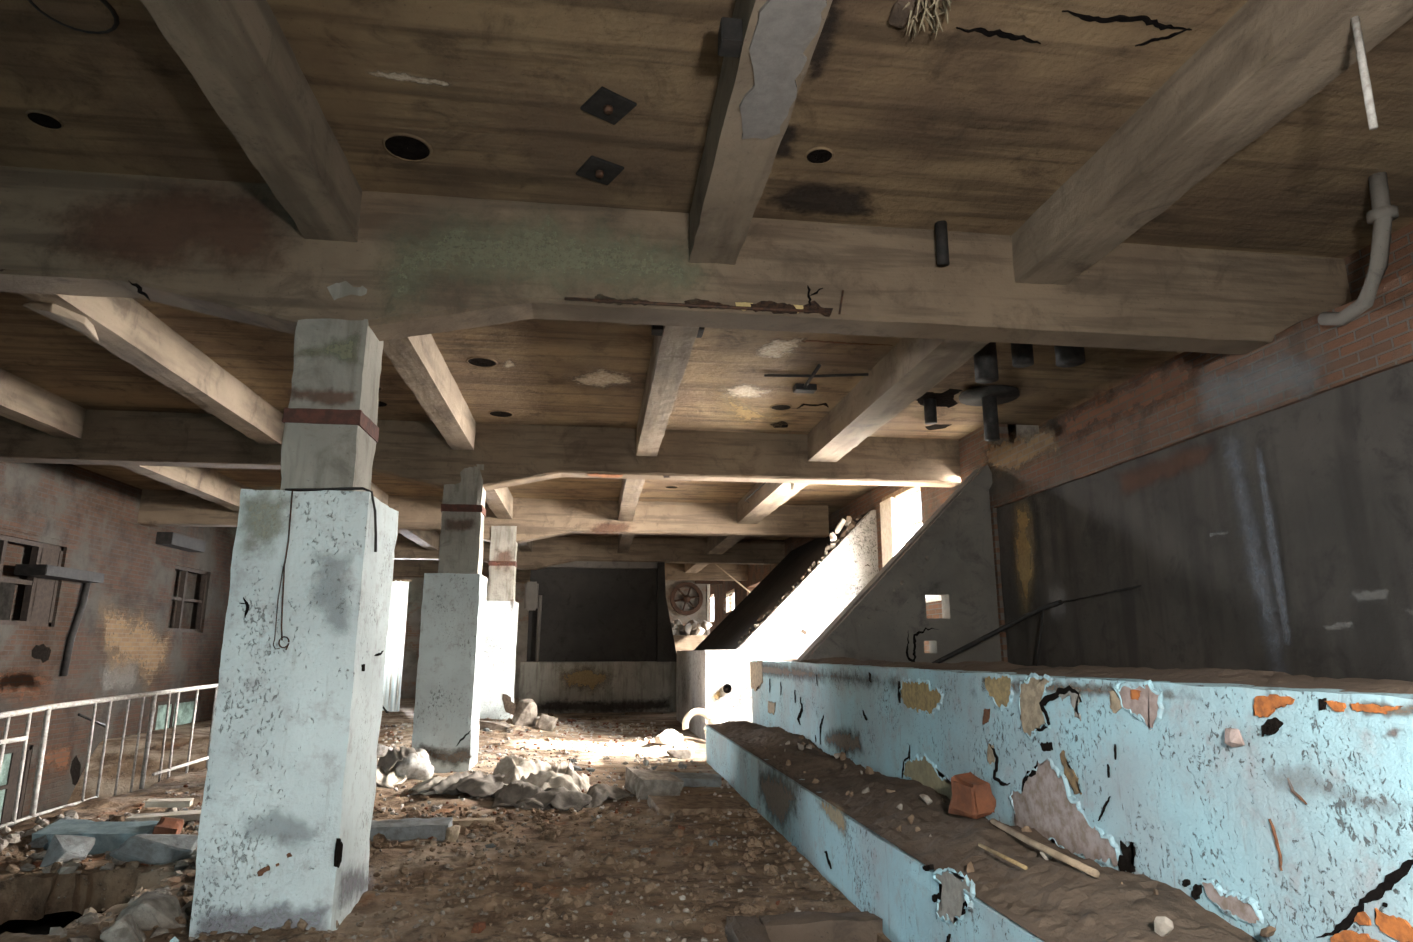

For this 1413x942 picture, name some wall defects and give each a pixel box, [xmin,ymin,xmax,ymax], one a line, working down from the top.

crack [956,27,1041,44]
crack [1062,10,1192,47]
peeling [985,673,1081,741]
crack [989,685,1082,792]
peeling [1109,680,1164,730]
flaking render [1253,694,1295,737]
flaking render [1326,700,1402,714]
peeling [1010,757,1136,873]
peeling [922,864,976,926]
peeling [1182,877,1264,927]
crack [1316,860,1413,938]
flaking render [1330,908,1413,942]